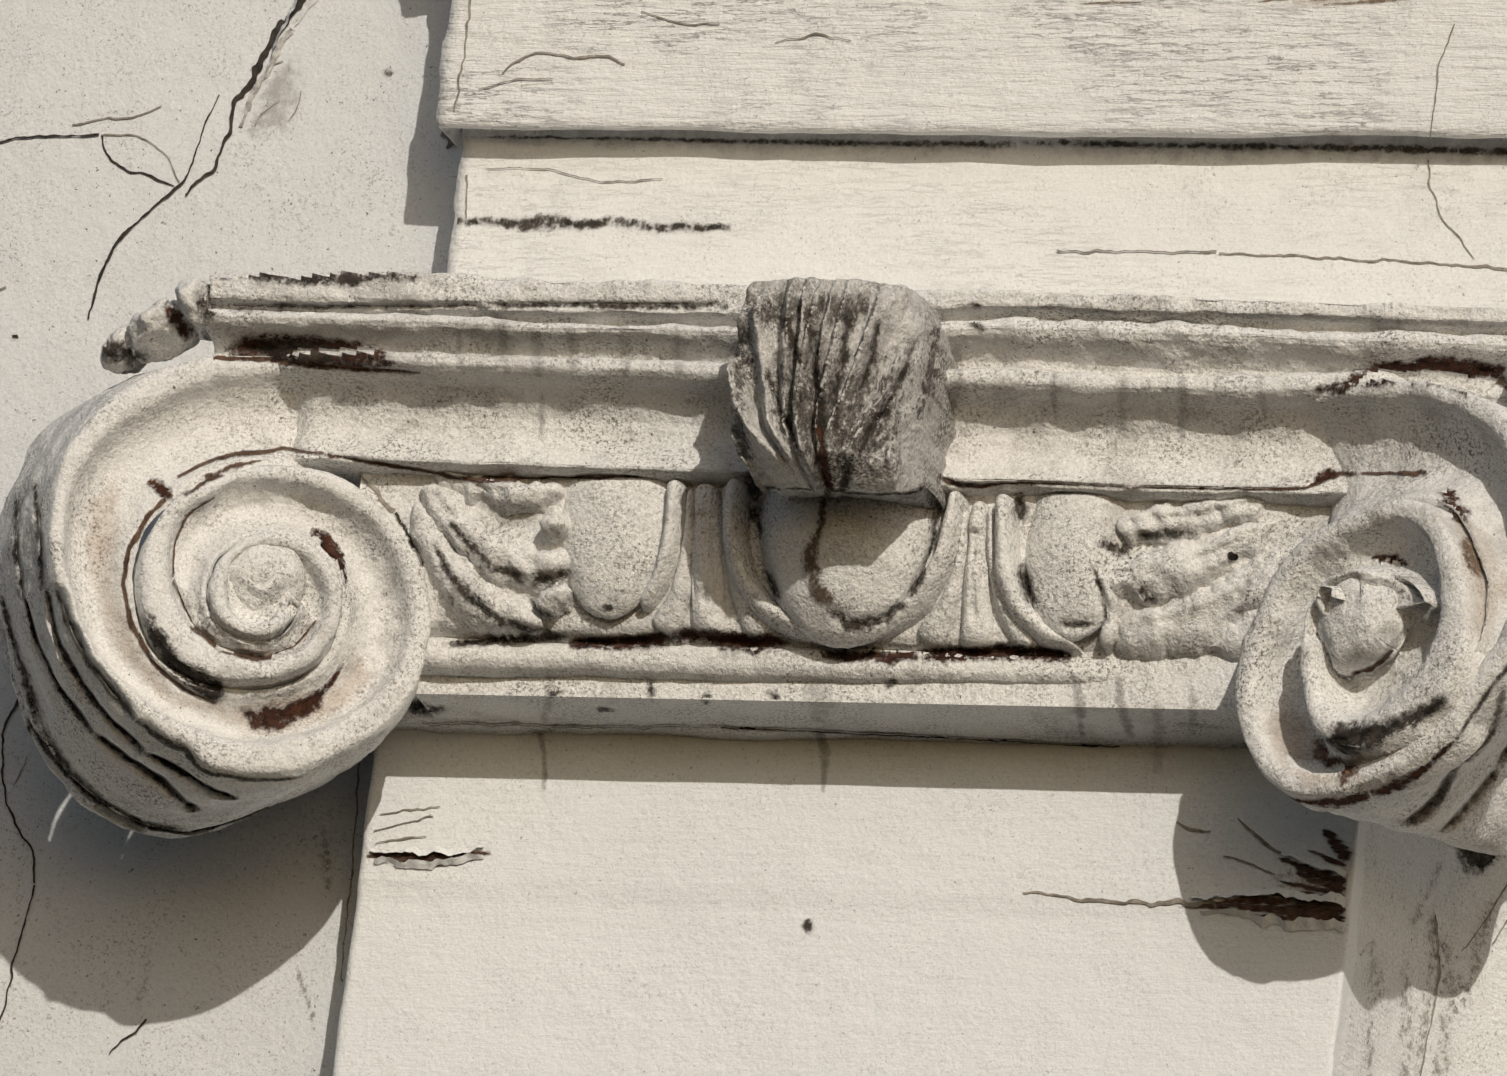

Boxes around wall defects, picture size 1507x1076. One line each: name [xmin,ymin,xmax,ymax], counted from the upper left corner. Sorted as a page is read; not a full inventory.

crack [0,0,317,319]
crack [1057,24,1507,271]
corrosion [213,333,420,374]
corrosion [242,663,344,732]
crack [0,699,35,1020]
peeling [367,806,491,870]
peeling [1023,818,1352,933]